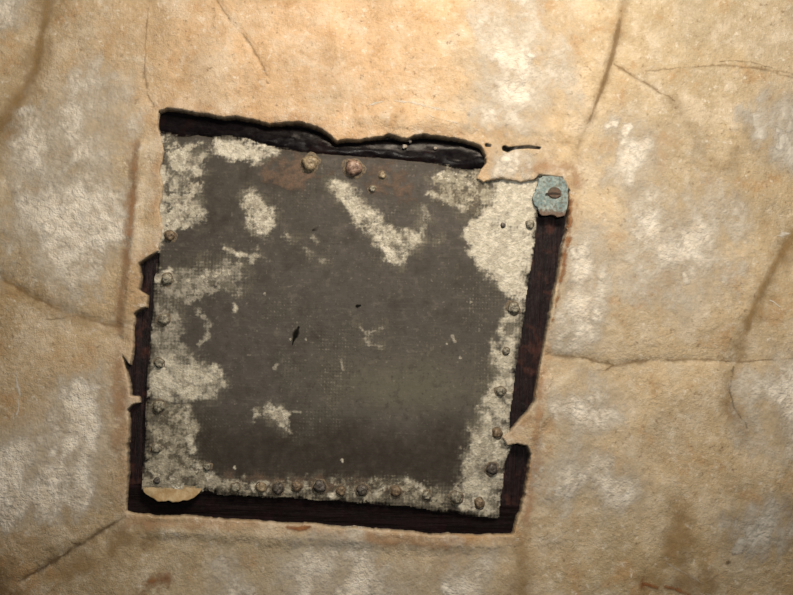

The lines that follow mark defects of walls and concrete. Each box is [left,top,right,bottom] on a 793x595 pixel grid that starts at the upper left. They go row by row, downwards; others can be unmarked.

water stain [9,58,132,296]
peeling [159,135,281,247]
water stain [492,150,531,179]
water stain [736,99,793,165]
water stain [553,116,747,353]
peeling [142,166,538,516]
water stain [548,383,623,433]
water stain [737,360,793,437]
water stain [0,377,101,533]
water stain [535,453,639,517]
crack [28,522,115,576]
water stain [284,525,395,595]